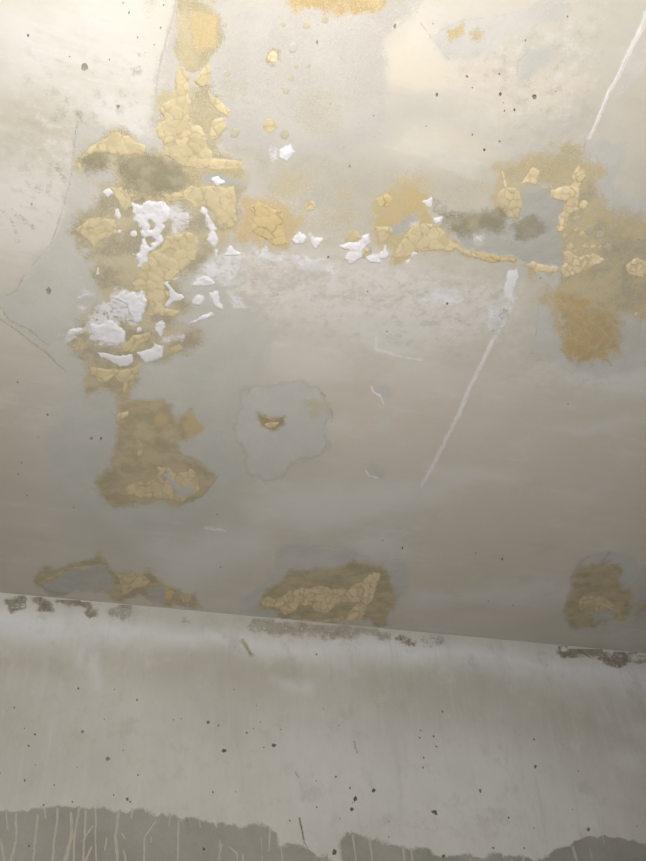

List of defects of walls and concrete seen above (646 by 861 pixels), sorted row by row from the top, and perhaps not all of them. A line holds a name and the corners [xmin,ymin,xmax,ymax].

crack [587,9,646,140]
leakage [58,0,646,511]
peeling [454,183,567,268]
crack [386,269,519,566]
spalling [2,596,133,622]
spalling [246,618,445,648]
spalling [556,646,646,669]